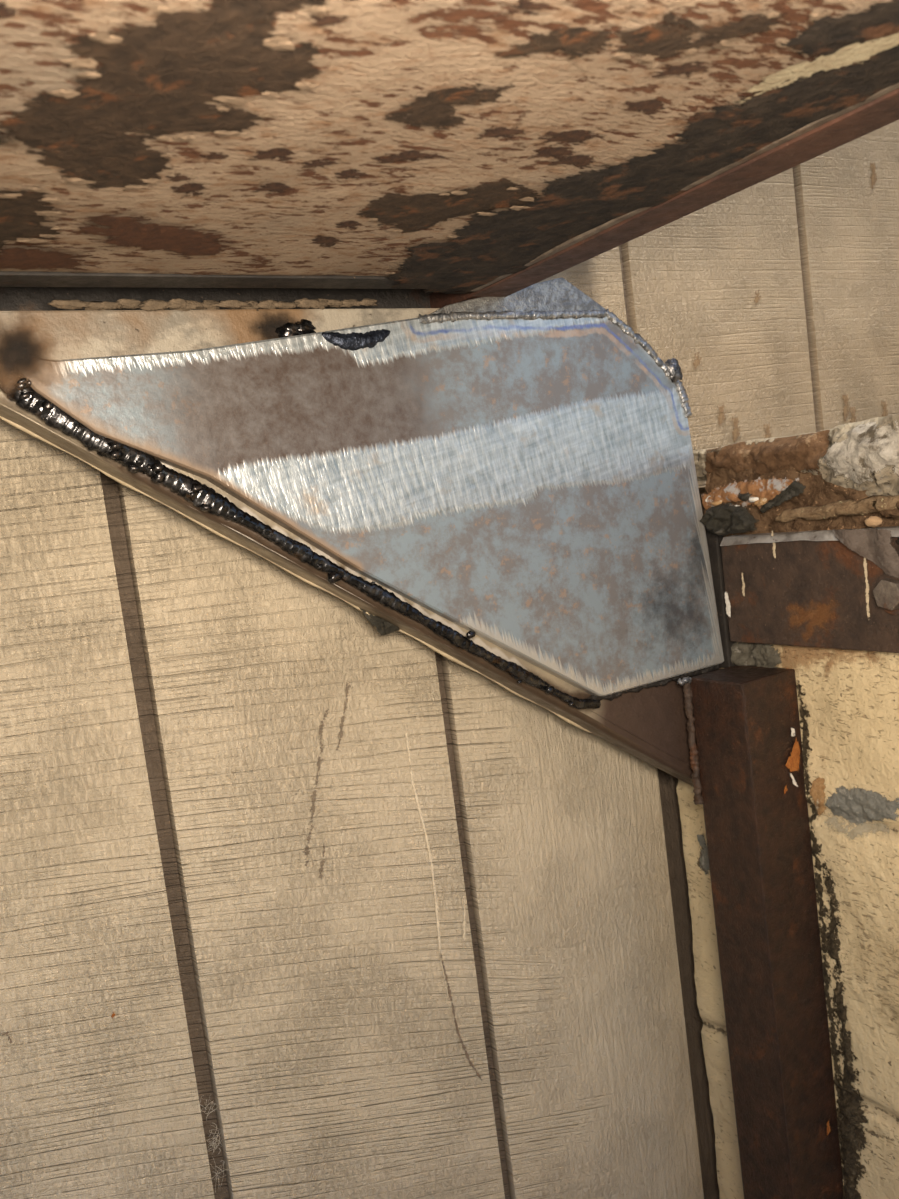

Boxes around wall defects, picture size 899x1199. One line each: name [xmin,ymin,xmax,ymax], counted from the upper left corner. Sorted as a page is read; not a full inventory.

rust [0,0,355,199]
peeling [739,32,899,104]
rust [243,148,445,180]
rust [311,0,899,294]
rust [0,188,242,271]
spalling [701,420,899,513]
rust [784,739,800,794]
crack [441,955,482,1080]